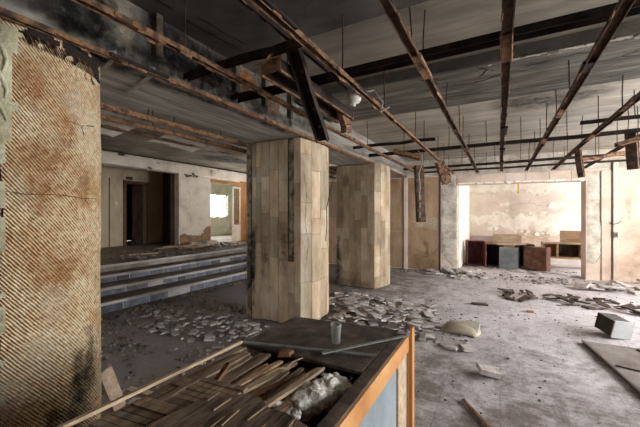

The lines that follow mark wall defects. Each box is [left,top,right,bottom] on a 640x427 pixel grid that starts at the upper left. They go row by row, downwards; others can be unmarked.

leakage [47,0,104,39]
leakage [163,22,221,63]
peeling [0,23,101,163]
peeling [179,224,211,245]